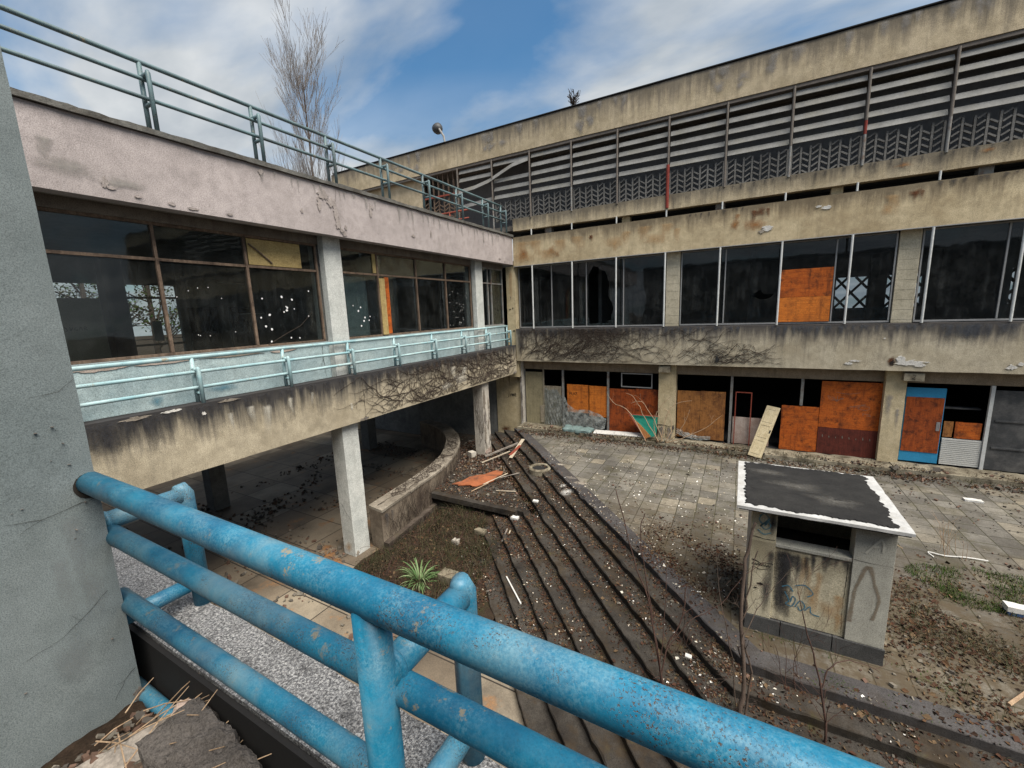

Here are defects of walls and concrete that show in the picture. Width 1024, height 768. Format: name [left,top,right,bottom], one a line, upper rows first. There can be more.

spalling [889,356,930,367]
damp [85,370,389,449]
damp [763,553,848,611]